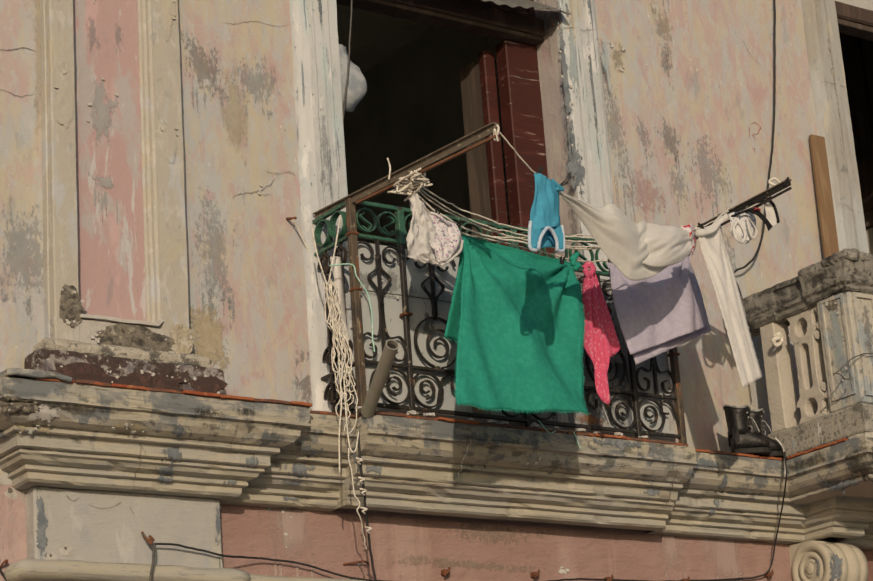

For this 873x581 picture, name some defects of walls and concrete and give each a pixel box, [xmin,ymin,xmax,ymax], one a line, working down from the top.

spalling [59,284,85,328]
peeling [50,362,228,394]
spalling [0,396,70,435]